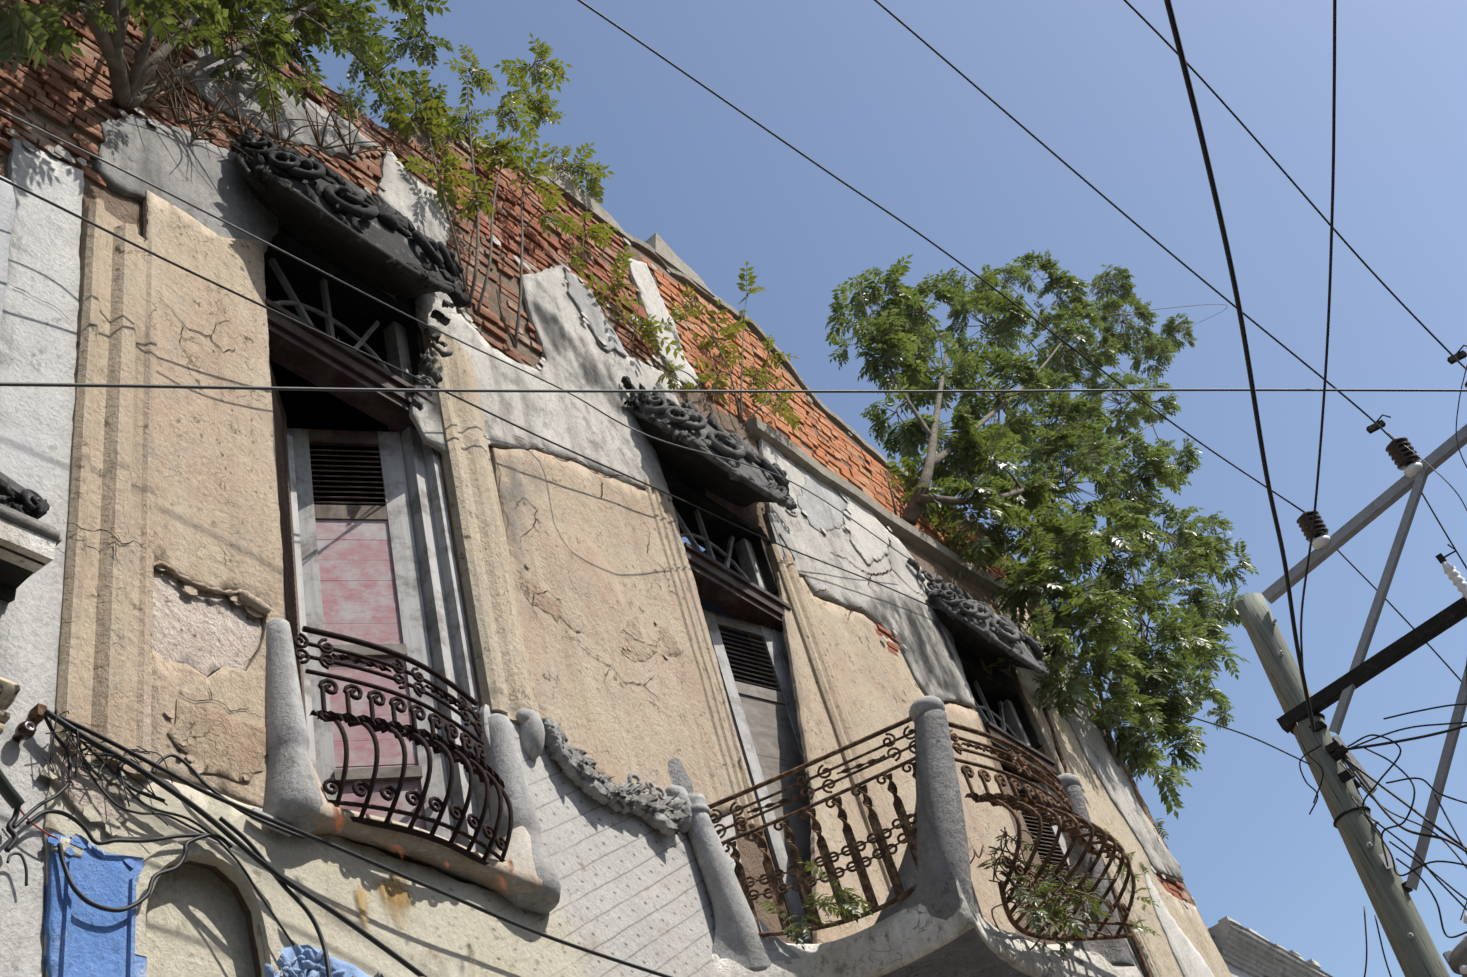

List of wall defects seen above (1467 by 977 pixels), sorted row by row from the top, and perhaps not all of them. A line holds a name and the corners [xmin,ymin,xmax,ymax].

crack [157,289,235,357]
spalling [0,0,1008,578]
crack [496,435,683,598]
spalling [152,560,274,677]
crack [578,630,656,696]
spalling [164,700,268,784]
corrosion [356,877,410,925]